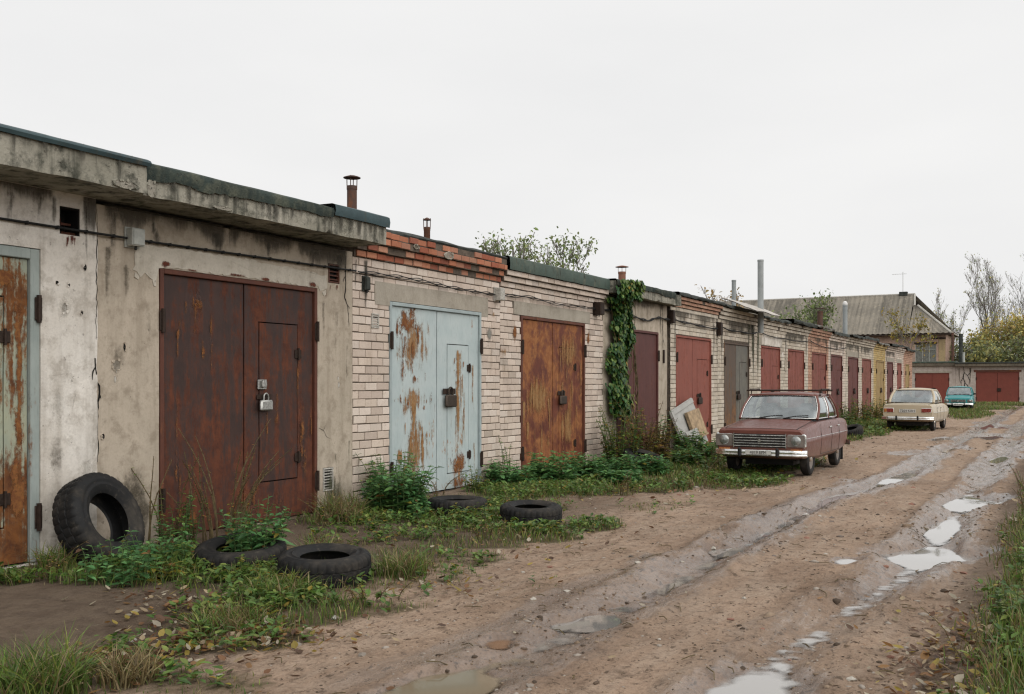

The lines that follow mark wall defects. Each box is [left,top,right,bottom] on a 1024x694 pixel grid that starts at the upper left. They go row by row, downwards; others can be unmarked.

water stain [0,181,55,217]
water stain [84,197,367,282]
corrosion [9,302,26,518]
corrosion [396,309,432,477]
corrosion [452,350,475,489]
corrosion [523,337,581,453]